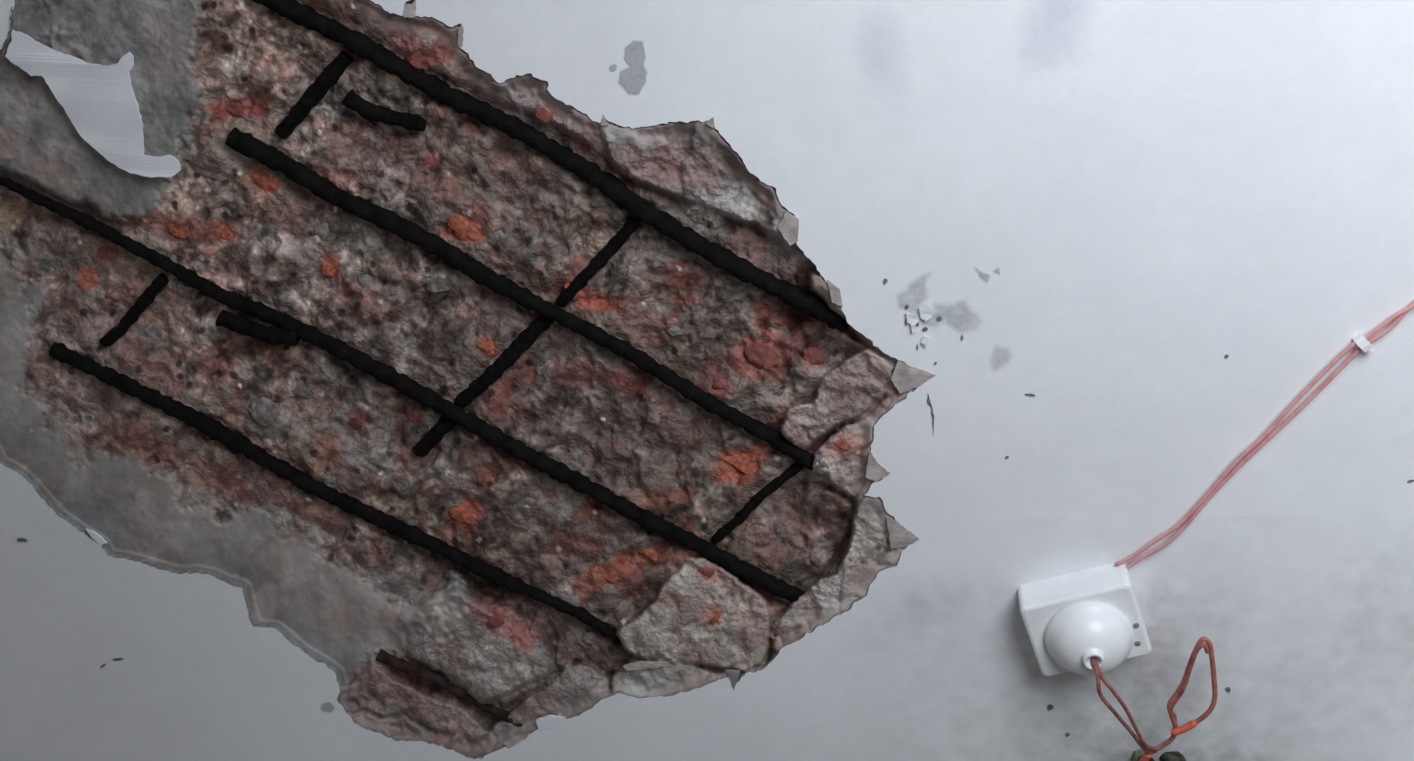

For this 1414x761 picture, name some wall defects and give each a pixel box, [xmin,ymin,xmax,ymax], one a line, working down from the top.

spalling [0,0,937,758]
peeling [905,304,962,350]